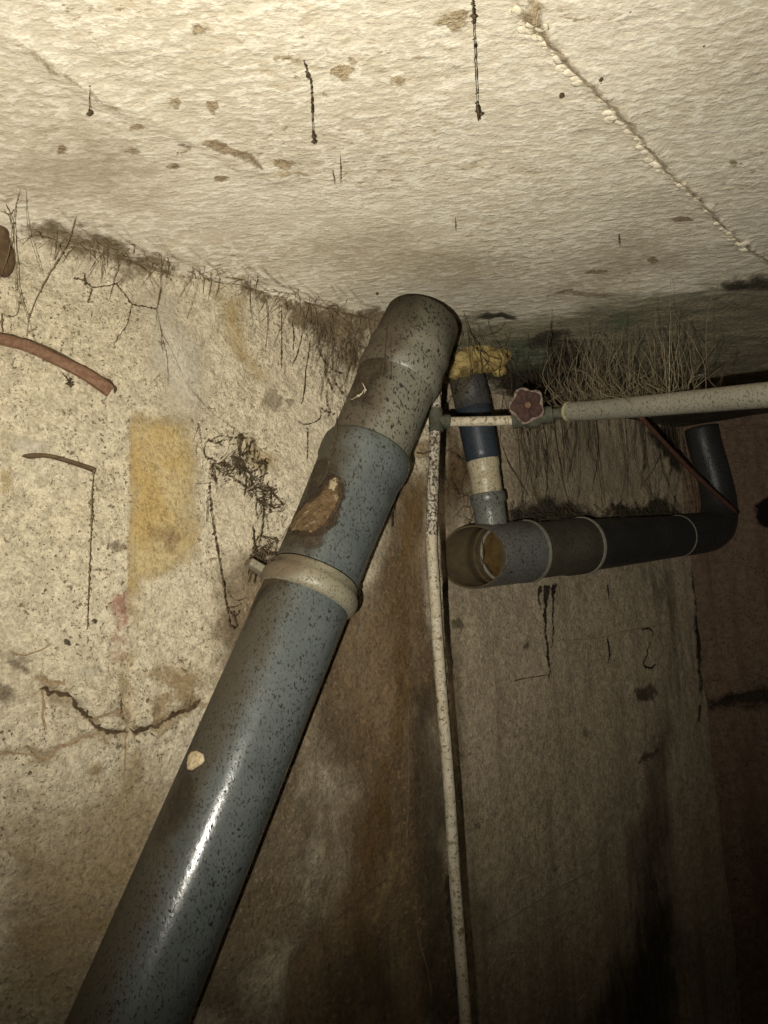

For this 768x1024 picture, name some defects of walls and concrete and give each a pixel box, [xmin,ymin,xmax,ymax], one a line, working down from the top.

leakage [28,222,175,283]
rust [0,333,113,397]
leakage [241,282,385,370]
leakage [110,418,196,624]
leakage [538,584,557,677]
crack [0,677,201,781]